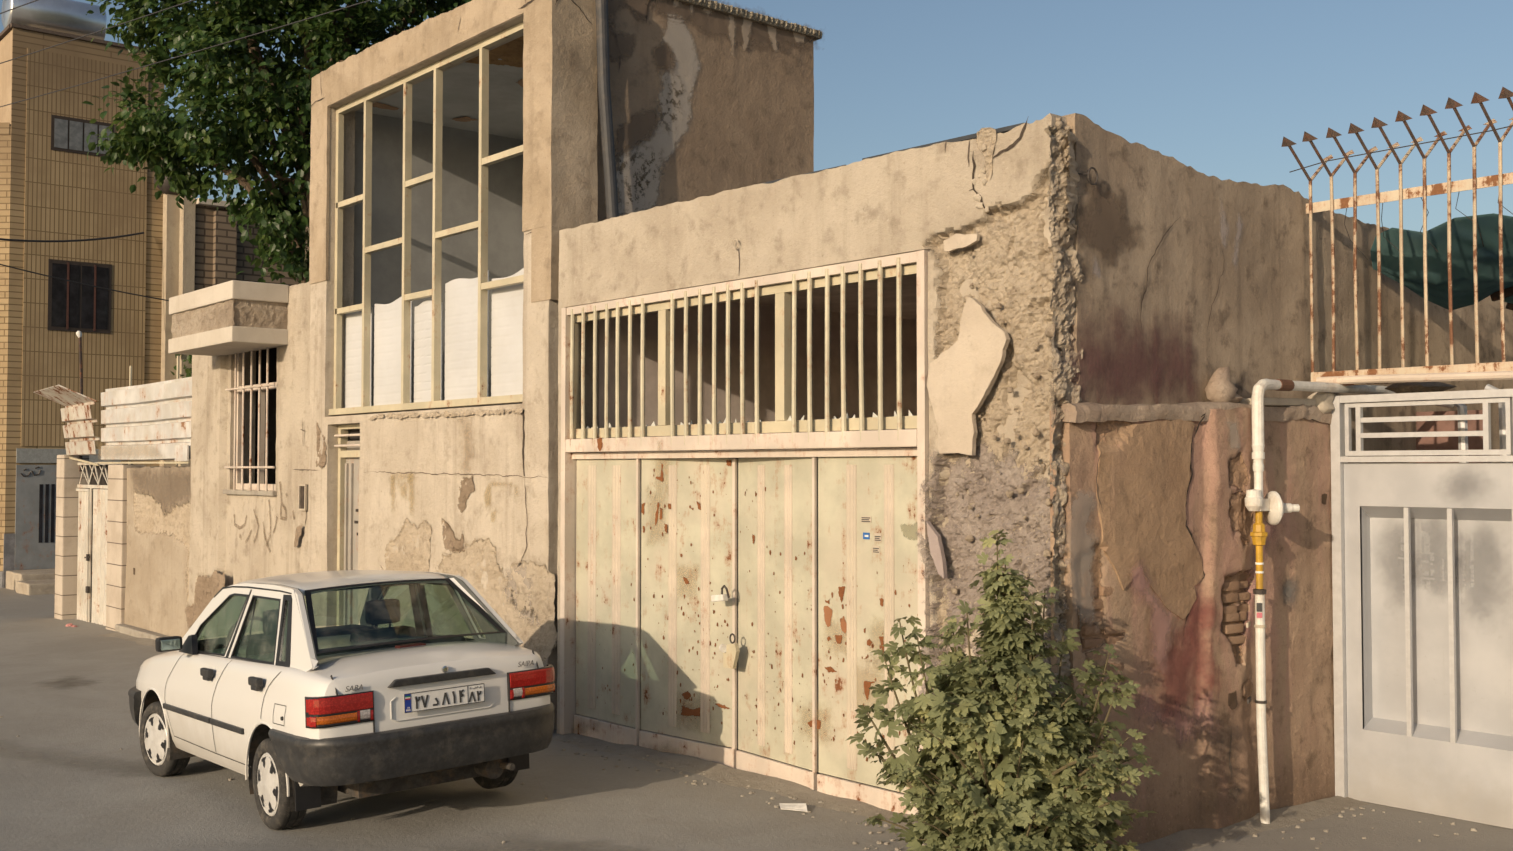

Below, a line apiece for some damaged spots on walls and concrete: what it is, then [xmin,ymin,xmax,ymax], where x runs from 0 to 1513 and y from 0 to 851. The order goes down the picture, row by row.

water stain [1079,184,1136,274]
spalling [133,490,225,628]
spalling [379,476,558,661]
corrosion [641,460,731,536]
corrosion [653,543,730,724]
corrosion [746,586,900,762]
spalling [917,117,1205,707]
water stain [1073,319,1194,404]
water stain [1133,566,1213,740]
flaking render [1220,571,1252,664]